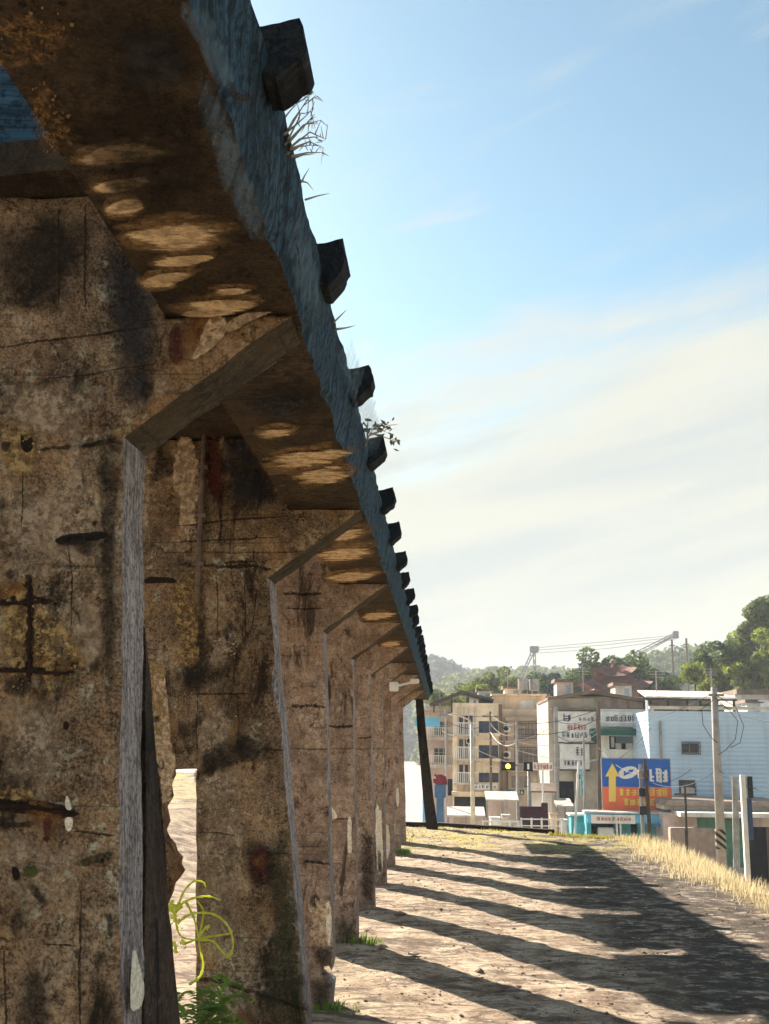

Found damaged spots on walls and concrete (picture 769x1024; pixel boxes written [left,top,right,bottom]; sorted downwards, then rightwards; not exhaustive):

crack [0,329,162,380]
spalling [173,284,270,359]
damp [224,436,274,506]
peeling [150,658,188,803]